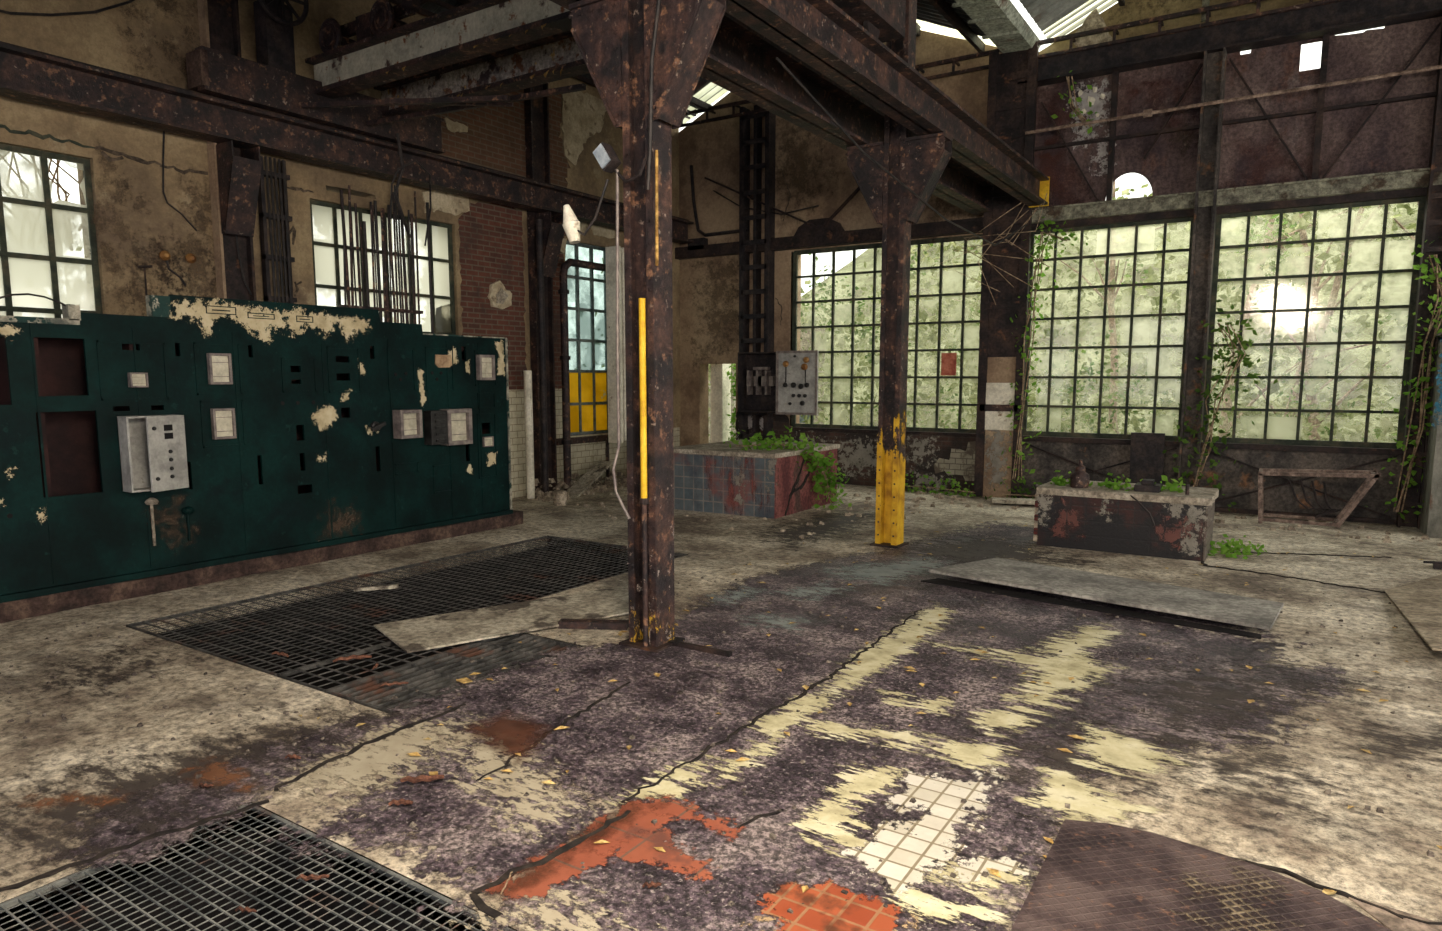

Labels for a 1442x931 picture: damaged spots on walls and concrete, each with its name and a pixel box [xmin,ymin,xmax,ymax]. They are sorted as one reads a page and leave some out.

flaking render [431,67,563,177]
peeling [549,91,607,188]
peeling [0,324,21,337]
peeling [169,298,371,343]
flaking render [422,190,527,390]
flaking render [553,222,615,389]
peeling [417,369,426,407]
peeling [467,451,498,475]
crack [1233,857,1442,925]